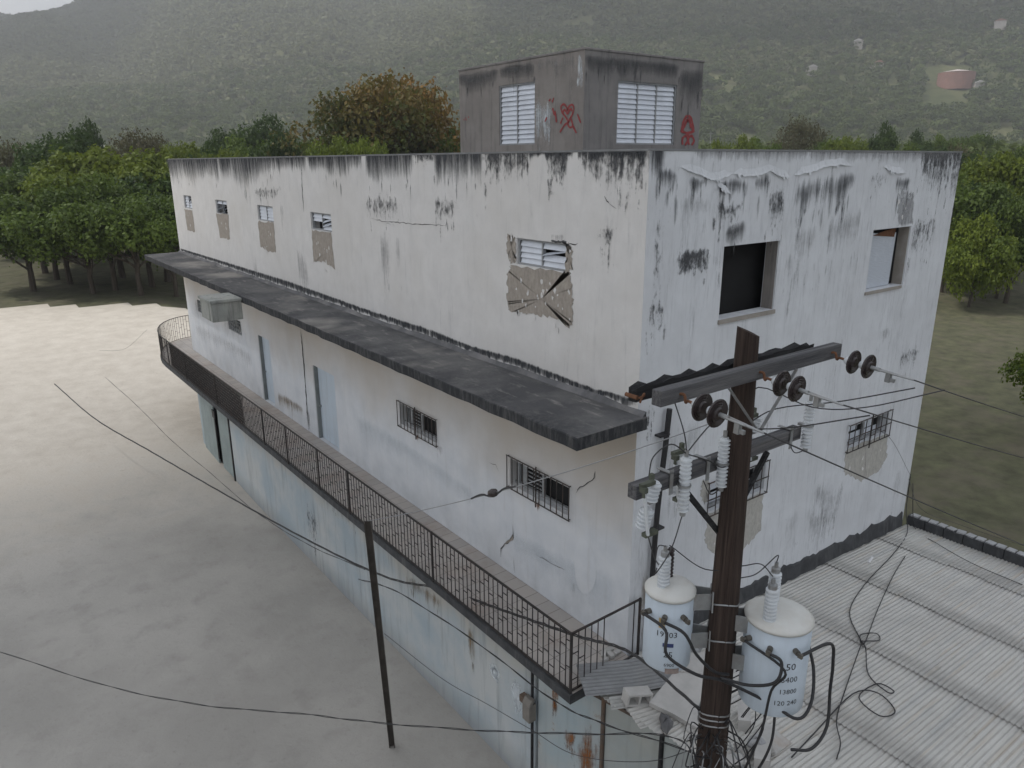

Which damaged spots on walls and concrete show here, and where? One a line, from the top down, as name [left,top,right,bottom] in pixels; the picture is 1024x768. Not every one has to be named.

damp [166,151,676,212]
damp [713,182,745,247]
peeling [680,158,852,194]
damp [798,178,851,219]
damp [874,152,962,193]
peeling [258,221,276,253]
peeling [312,230,335,271]
peeling [506,234,574,333]
damp [679,249,709,280]
peeling [700,477,719,554]
peeling [743,494,763,549]
corrosion [566,734,597,768]